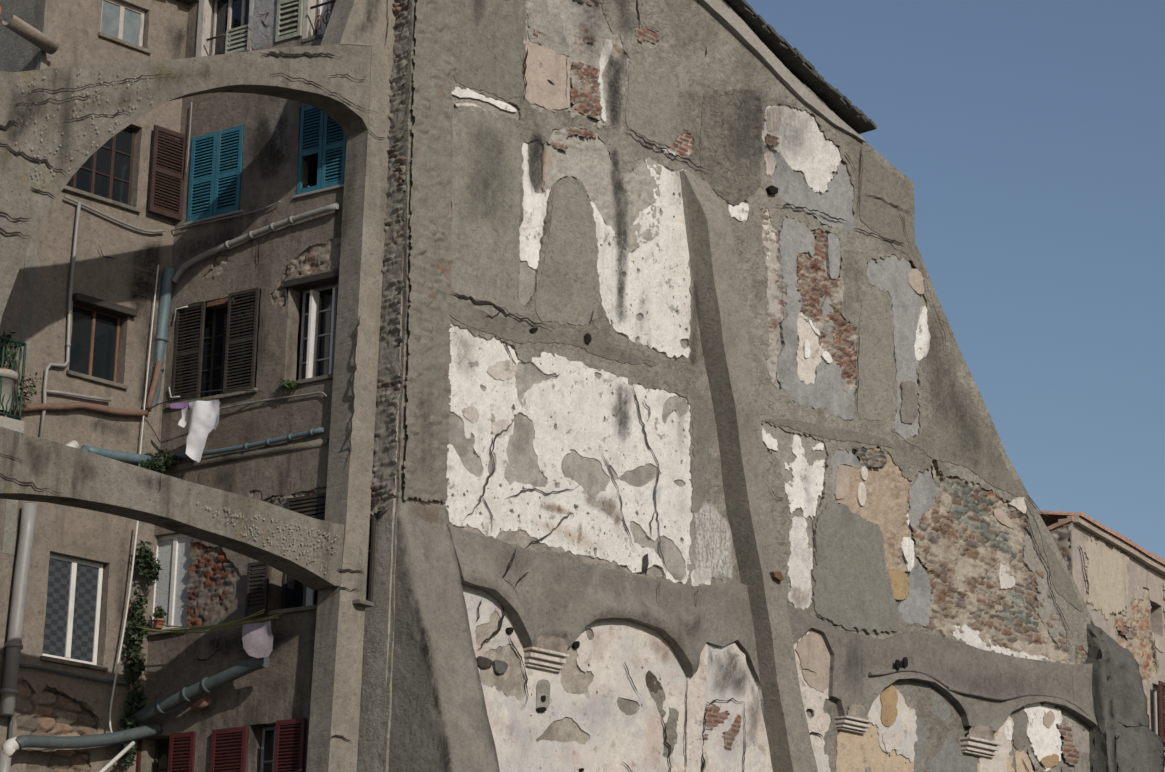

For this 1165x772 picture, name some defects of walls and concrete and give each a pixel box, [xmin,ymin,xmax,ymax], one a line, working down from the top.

crack [0,74,168,239]
flaking render [452,0,696,358]
flaking render [762,105,842,194]
spalling [727,201,858,395]
crack [347,317,360,463]
flaking render [446,324,736,586]
crack [601,385,668,592]
spalling [761,422,1087,665]
peeling [645,670,662,693]
spalling [702,704,743,750]
flaking render [794,629,918,772]
flaking render [977,702,1090,772]